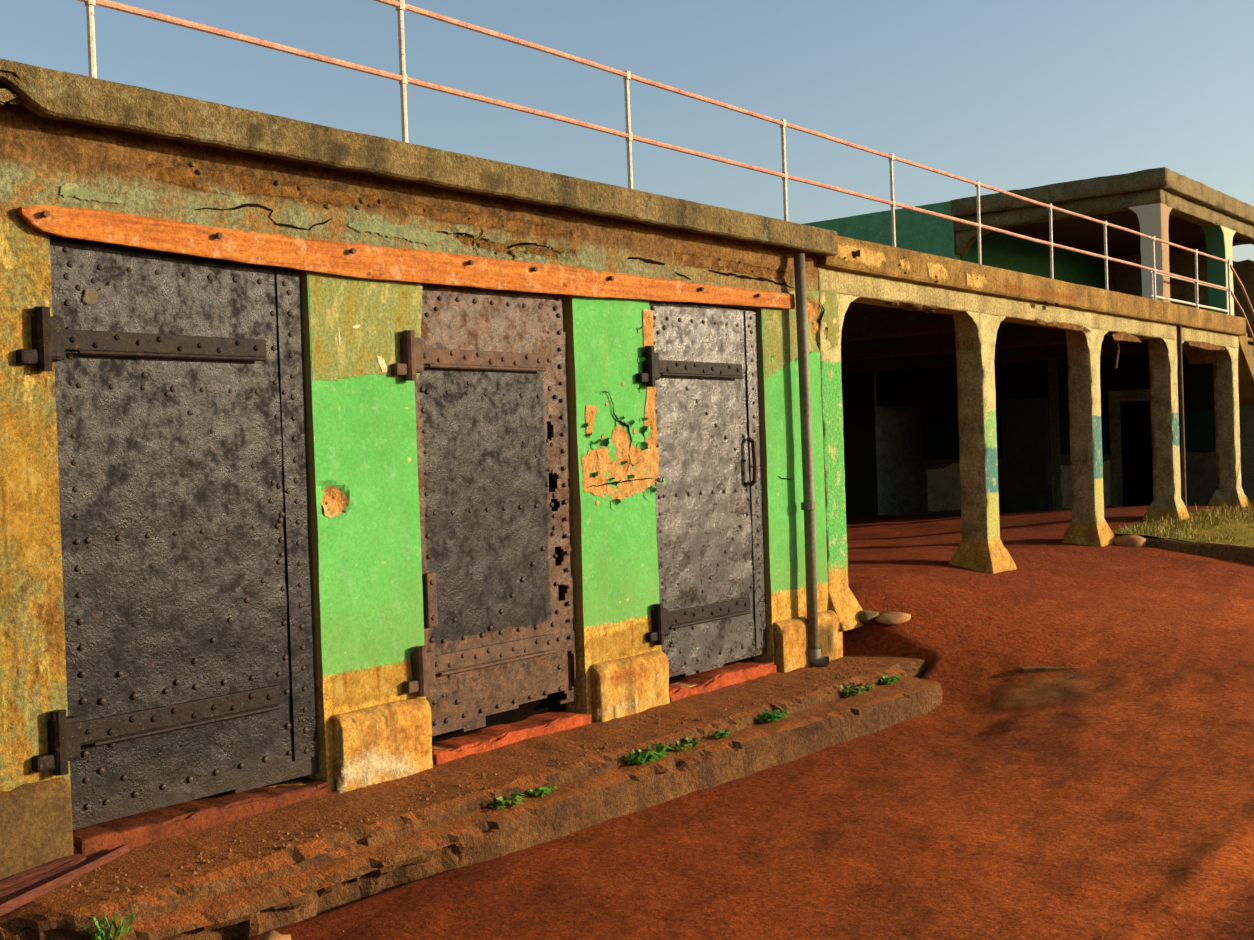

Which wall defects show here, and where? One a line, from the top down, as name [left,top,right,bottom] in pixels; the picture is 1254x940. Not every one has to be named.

spalling [0,88,22,106]
crack [195,203,332,231]
crack [436,224,561,259]
peeling [308,271,423,381]
peeling [637,309,655,362]
peeling [582,381,665,509]
damp [1,410,41,564]
spalling [322,486,348,518]